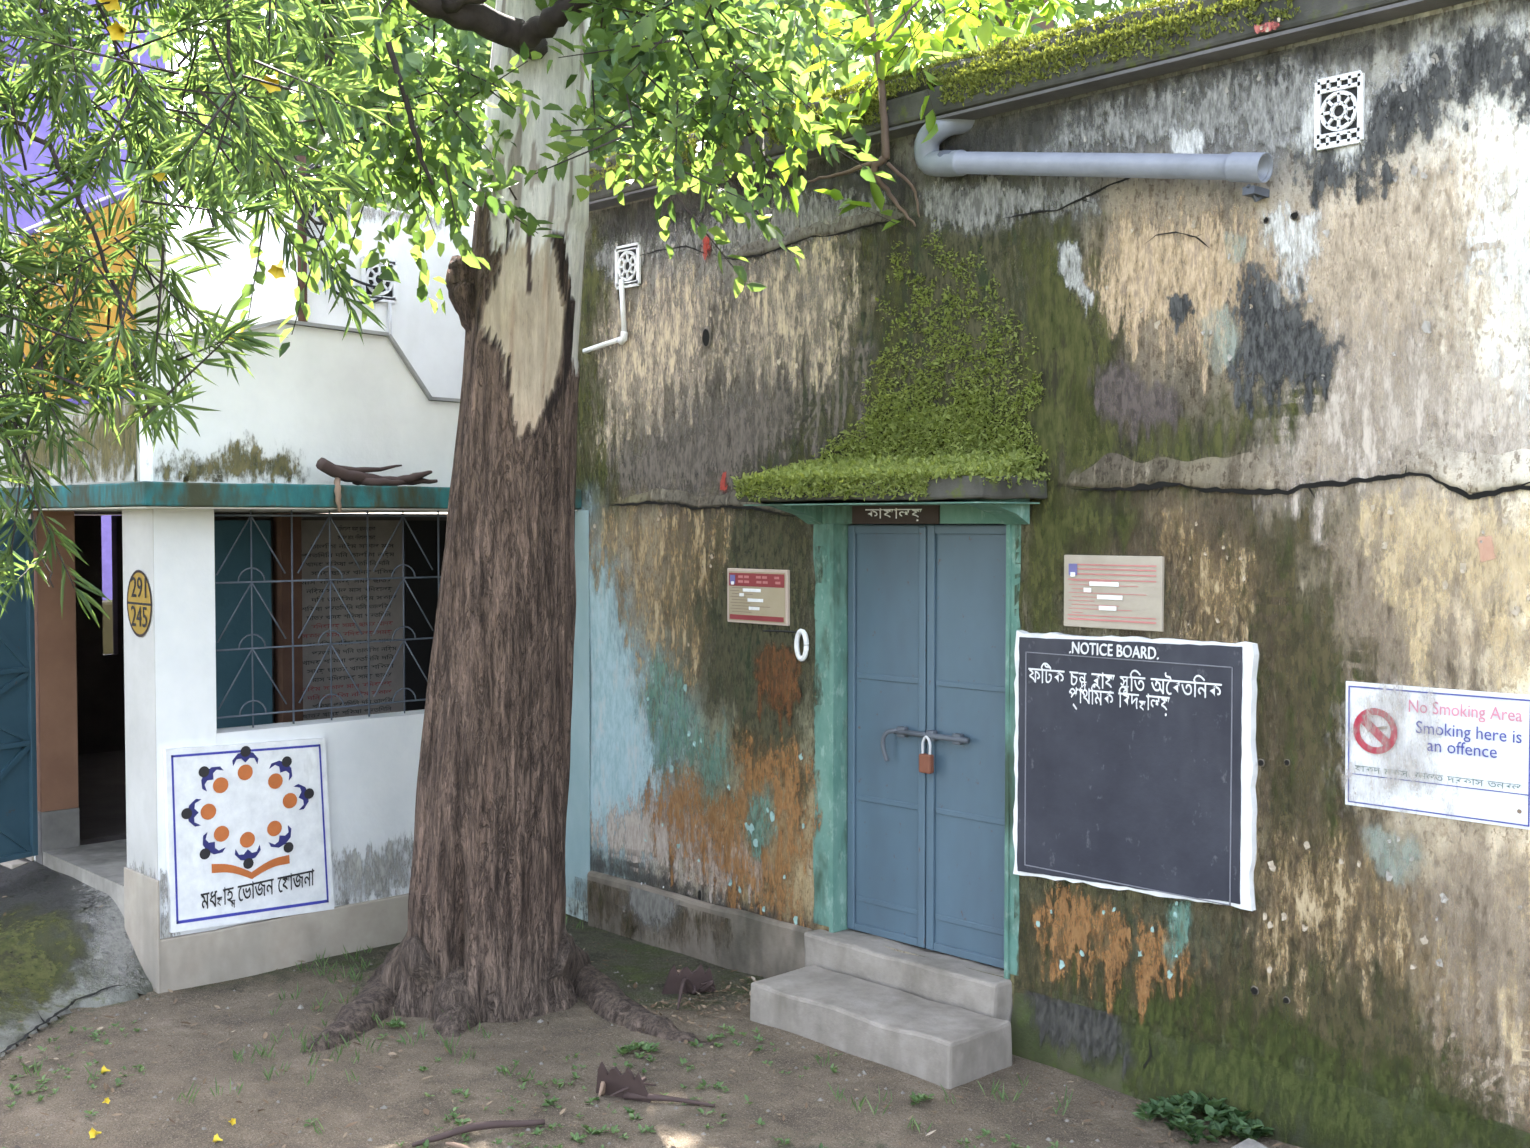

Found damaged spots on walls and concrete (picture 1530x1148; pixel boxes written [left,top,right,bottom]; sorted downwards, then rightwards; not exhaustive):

water stain [939,0,1530,210]
water stain [1225,260,1349,456]
water stain [600,142,1041,803]
crack [1055,465,1530,500]
rust [754,643,801,733]
water stain [1015,486,1530,1133]